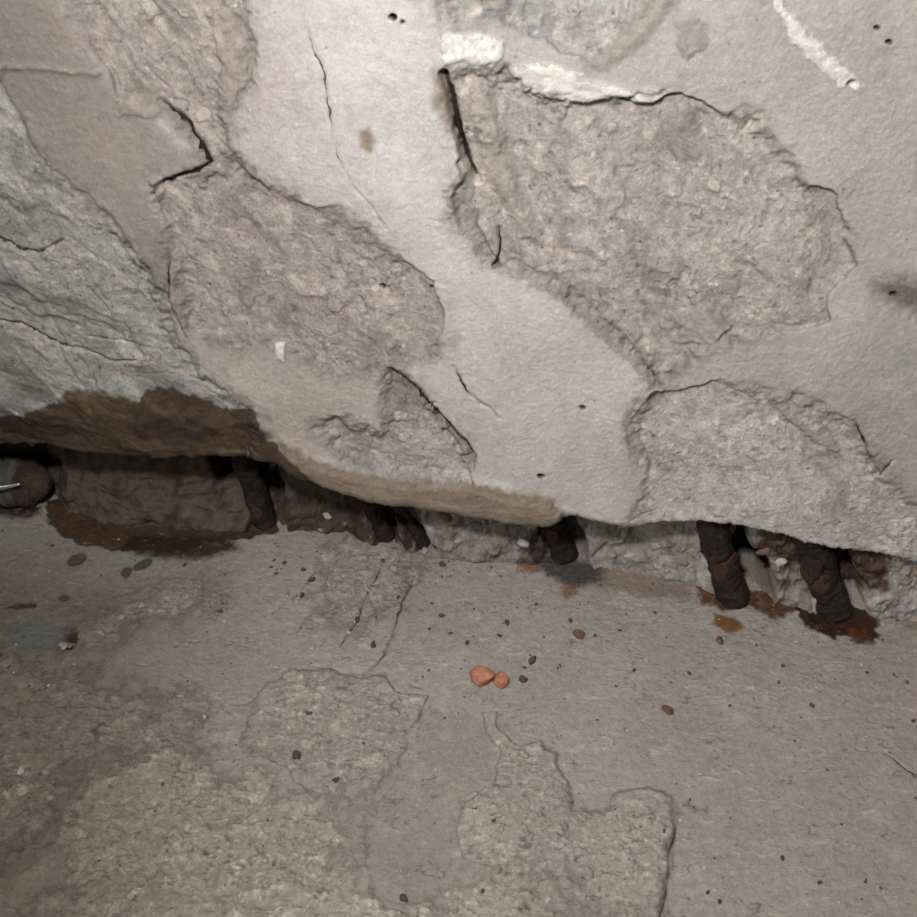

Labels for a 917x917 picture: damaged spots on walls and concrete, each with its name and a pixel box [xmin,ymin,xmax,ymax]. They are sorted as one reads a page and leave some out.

spalling [436,0,655,69]
crack [310,39,332,123]
crack [445,69,478,174]
crack [0,236,64,252]
spalling [0,0,476,488]
crack [495,227,503,261]
spalling [447,65,917,622]
spalling [231,455,277,531]
spalling [355,497,431,550]
rust [760,531,799,568]
rust [834,547,888,591]
rust [746,591,880,643]